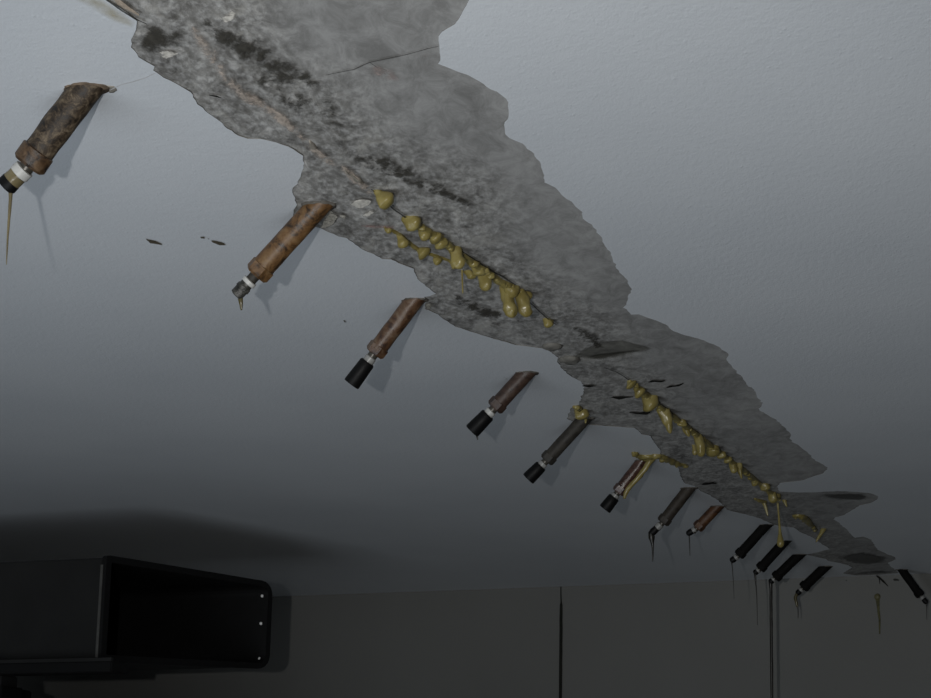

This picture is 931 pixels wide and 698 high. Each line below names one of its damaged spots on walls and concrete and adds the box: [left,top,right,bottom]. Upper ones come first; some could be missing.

crack [462,251,515,285]
peeling [110,0,898,575]